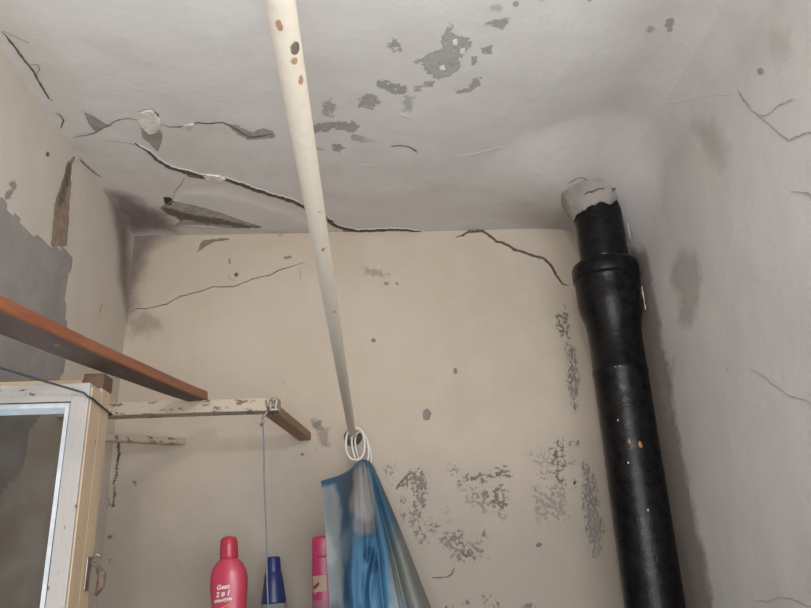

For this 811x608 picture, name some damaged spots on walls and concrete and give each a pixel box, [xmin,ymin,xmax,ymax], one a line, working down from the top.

peeling [415,27,492,87]
crack [1,31,305,209]
peeling [313,102,359,133]
peeling [358,80,407,110]
crack [666,91,811,141]
flaking render [0,156,99,328]
spalling [160,197,310,250]
crack [326,215,425,232]
crack [456,230,569,287]
crack [126,262,306,321]
flaking render [0,334,66,382]
flaking render [0,414,41,494]